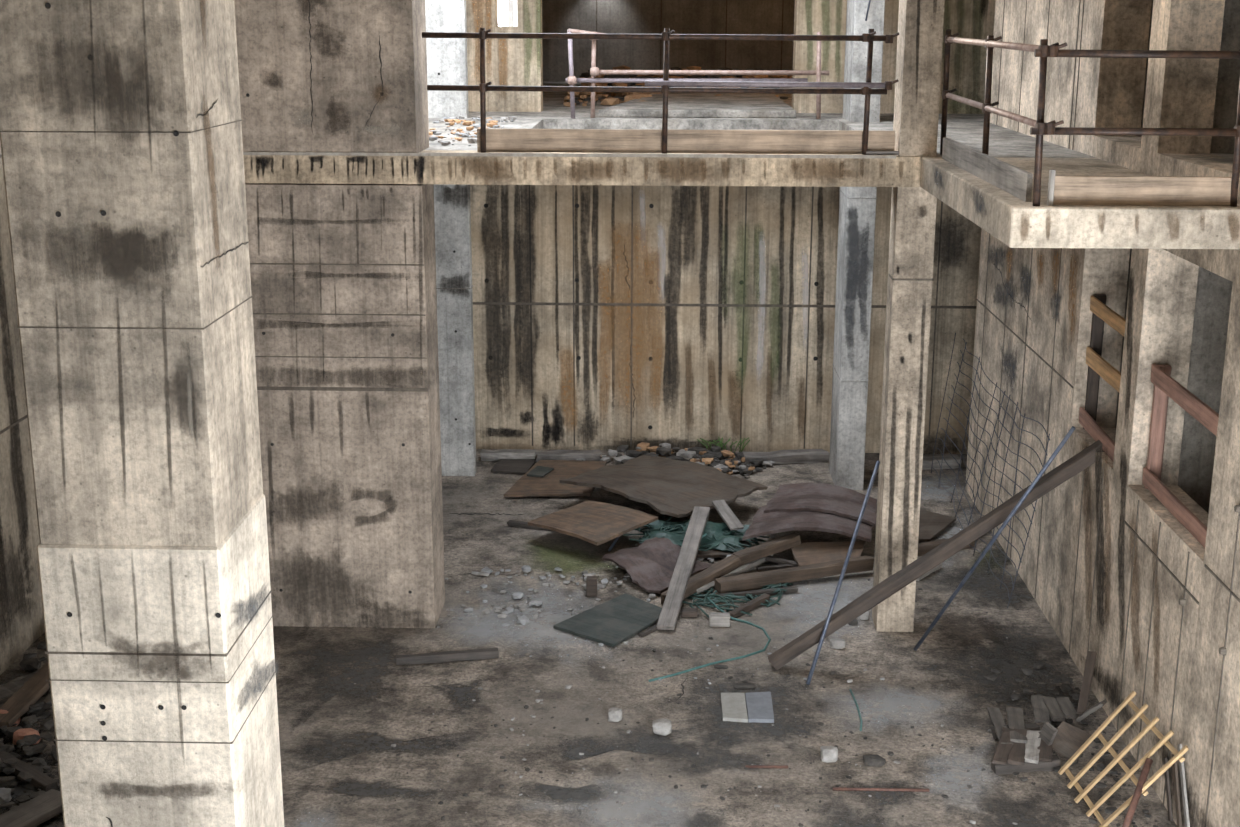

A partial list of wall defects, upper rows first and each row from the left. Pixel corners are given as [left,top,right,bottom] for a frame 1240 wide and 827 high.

damp [49,225,169,289]
damp [162,312,197,481]
damp [441,161,539,396]
damp [574,163,615,444]
damp [613,439,712,450]
damp [658,162,729,408]
damp [760,161,847,399]
damp [920,208,968,270]